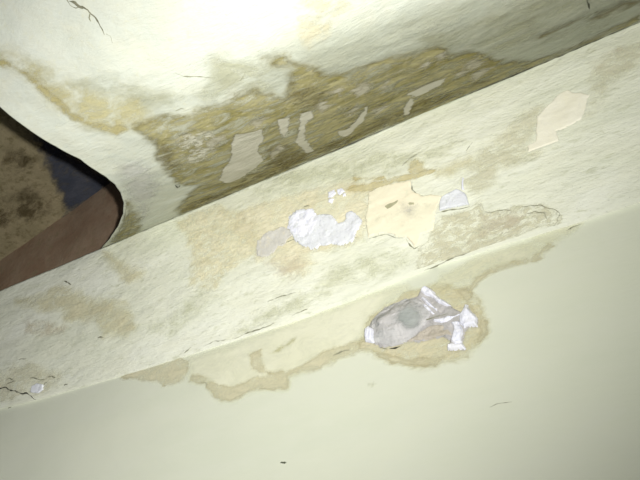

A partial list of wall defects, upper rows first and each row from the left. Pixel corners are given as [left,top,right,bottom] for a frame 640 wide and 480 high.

crack [67,0,112,40]
water stain [569,15,640,50]
peeling [527,90,590,152]
water stain [32,48,573,287]
peeling [256,178,470,257]
water stain [122,245,541,401]
spalling [364,286,479,351]
crack [0,376,67,400]